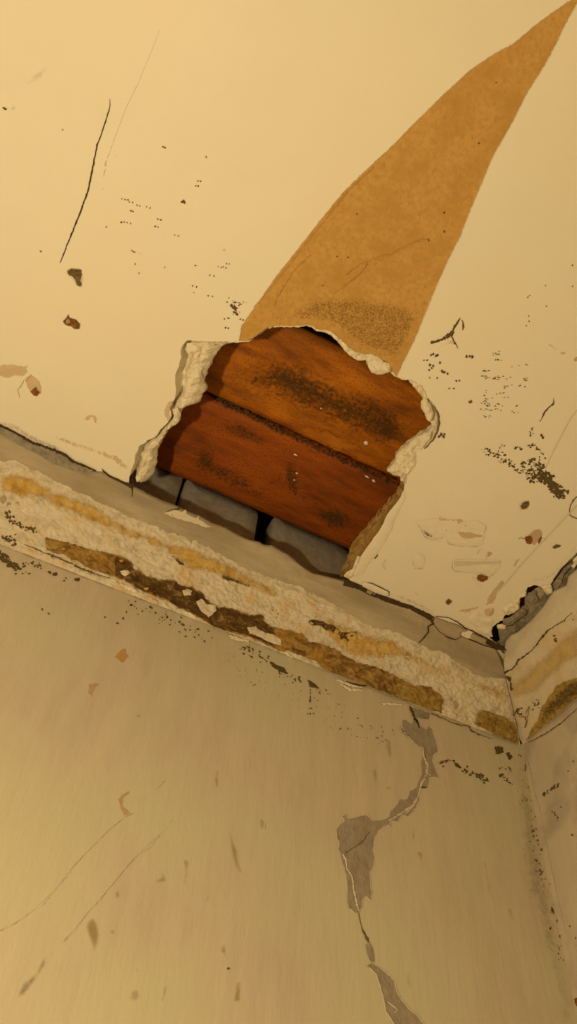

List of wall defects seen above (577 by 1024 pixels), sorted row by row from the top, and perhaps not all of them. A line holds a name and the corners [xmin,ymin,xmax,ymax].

crack [60,100,110,263]
spalling [104,324,438,577]
mould [481,427,569,499]
spalling [416,515,577,652]
peeling [45,537,444,913]
peeling [475,678,577,745]
crack [358,912,375,962]